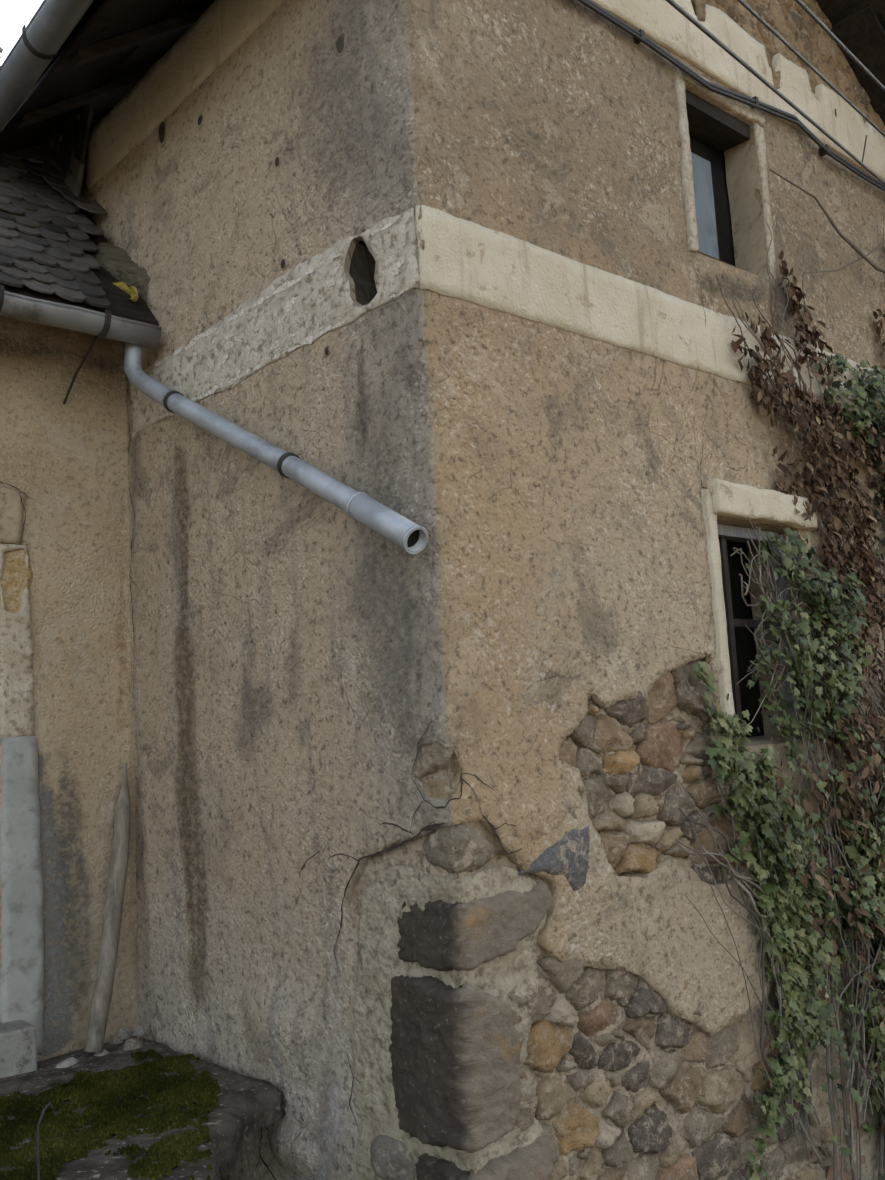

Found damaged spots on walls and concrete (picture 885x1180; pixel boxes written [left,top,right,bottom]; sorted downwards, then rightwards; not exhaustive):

peeling [144,208,420,403]
leakage [174,450,207,1003]
crack [301,719,522,978]
spalling [559,660,760,885]
spalling [508,955,866,1180]